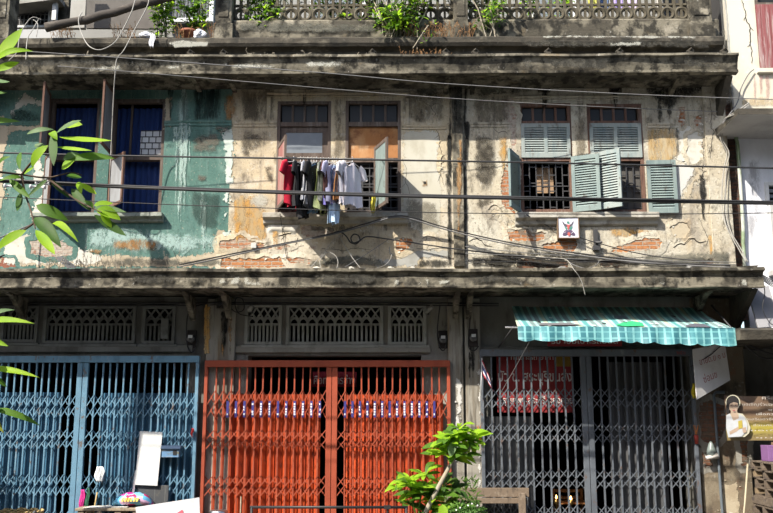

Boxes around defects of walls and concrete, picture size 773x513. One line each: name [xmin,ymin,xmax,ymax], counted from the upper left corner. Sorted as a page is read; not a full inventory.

crack [724,0,754,61]
leakage [478,88,531,96]
leakage [646,88,702,152]
peeling [0,92,42,220]
flaking render [0,225,340,269]
peeling [219,125,236,220]
peeling [389,130,442,258]
leakage [406,202,436,229]
leakage [419,86,496,267]
leakage [473,250,729,284]
flaking render [595,102,713,268]
crack [617,219,708,248]